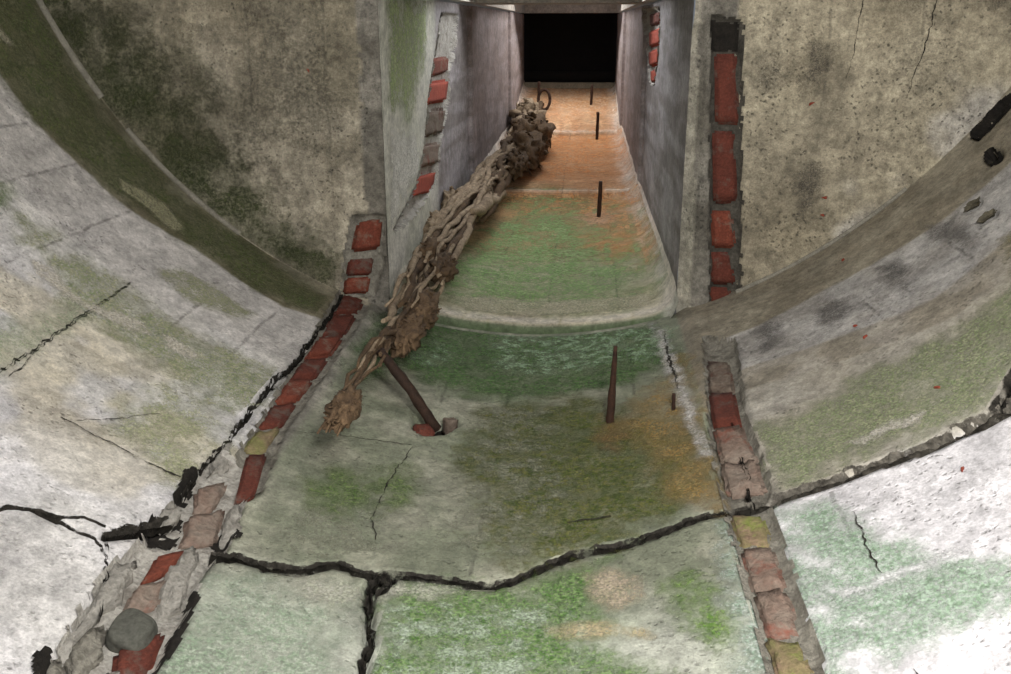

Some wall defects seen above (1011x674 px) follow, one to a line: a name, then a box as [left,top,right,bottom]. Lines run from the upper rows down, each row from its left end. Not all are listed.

hole [970,93,1011,167]
spalling [963,196,997,223]
crack [664,333,678,389]
crack [989,368,1011,421]
crack [0,294,344,624]
crack [299,431,413,539]
crack [208,457,755,674]
crack [854,512,882,573]